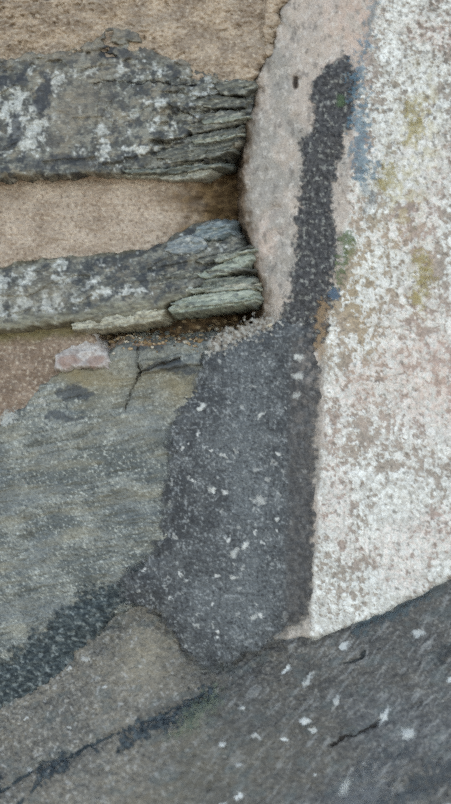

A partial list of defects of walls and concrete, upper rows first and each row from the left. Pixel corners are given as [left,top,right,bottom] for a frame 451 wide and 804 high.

leakage [205,40,380,356]
crack [135,348,173,383]